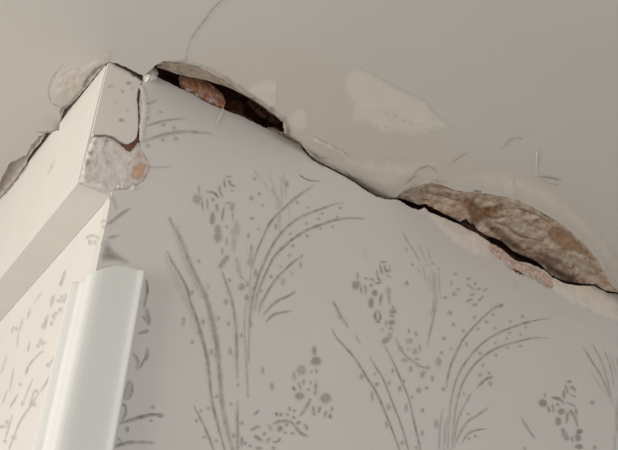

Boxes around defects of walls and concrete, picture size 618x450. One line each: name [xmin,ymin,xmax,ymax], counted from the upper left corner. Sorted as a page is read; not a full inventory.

peeling [49,52,150,191]
spalling [157,61,310,133]
spalling [0,134,46,197]
crack [284,133,398,200]
spalling [340,152,618,322]